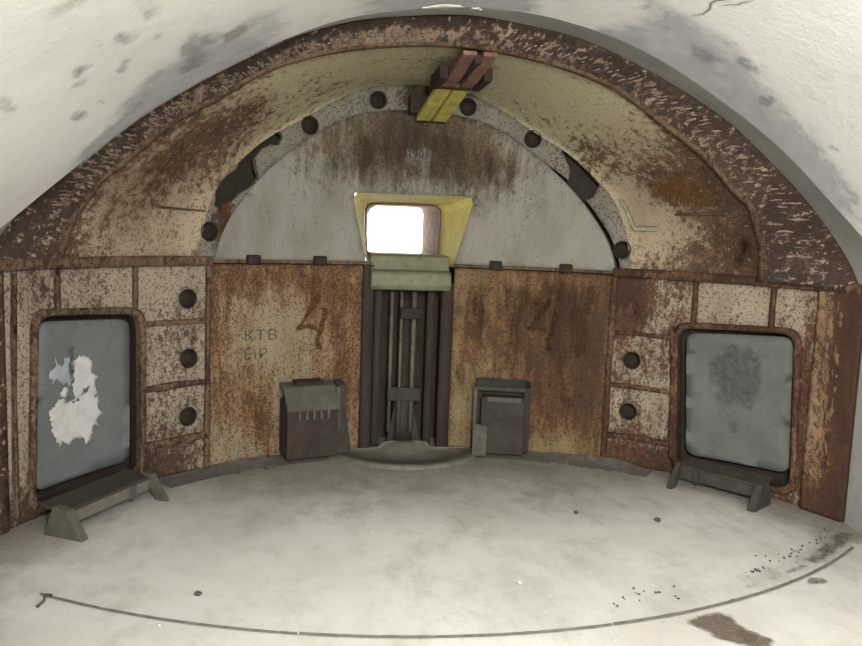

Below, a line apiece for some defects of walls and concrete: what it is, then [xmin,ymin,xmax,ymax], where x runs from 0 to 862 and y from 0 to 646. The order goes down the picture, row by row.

crack [691,0,754,16]
peeling [49,355,103,447]
water stain [690,613,772,646]